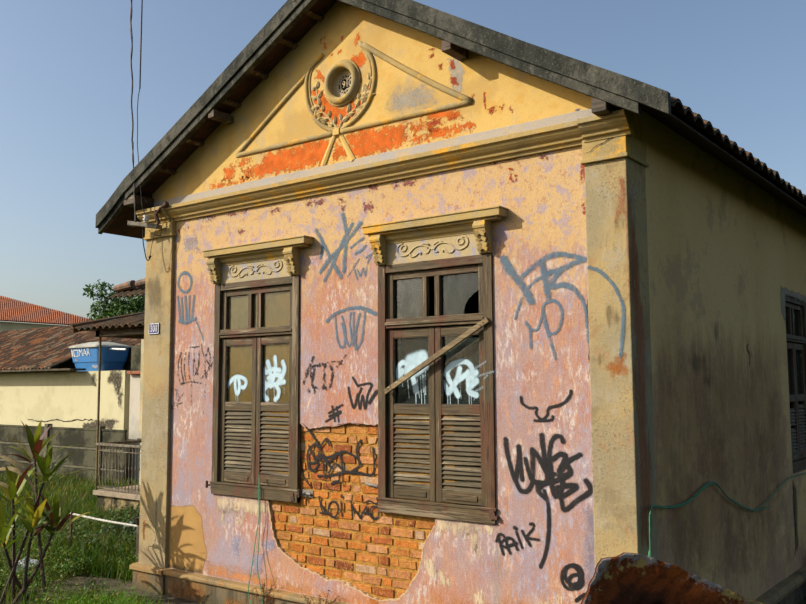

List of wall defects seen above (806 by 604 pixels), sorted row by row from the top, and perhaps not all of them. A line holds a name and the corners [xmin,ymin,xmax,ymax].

peeling [310,70,362,127]
peeling [350,32,366,67]
peeling [428,48,464,92]
peeling [209,103,476,189]
damp [107,371,123,406]
rust [609,224,649,542]
spalling [216,411,499,602]